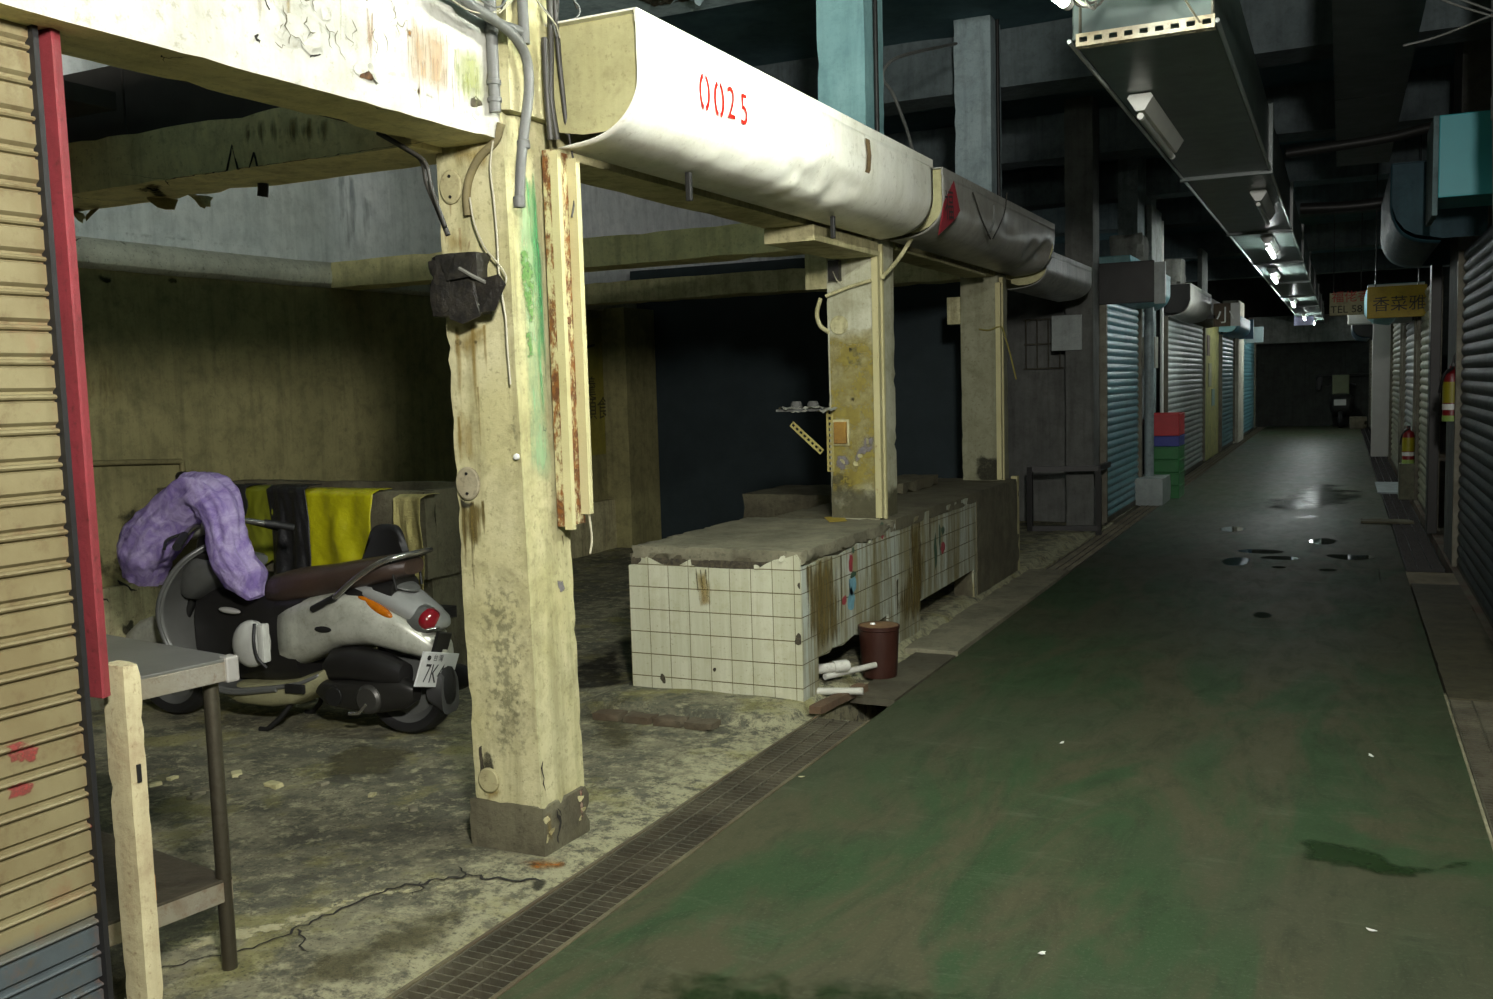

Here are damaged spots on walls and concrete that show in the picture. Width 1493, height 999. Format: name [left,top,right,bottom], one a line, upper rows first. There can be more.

water stain [1303,840,1430,876]
crack [162,866,541,967]